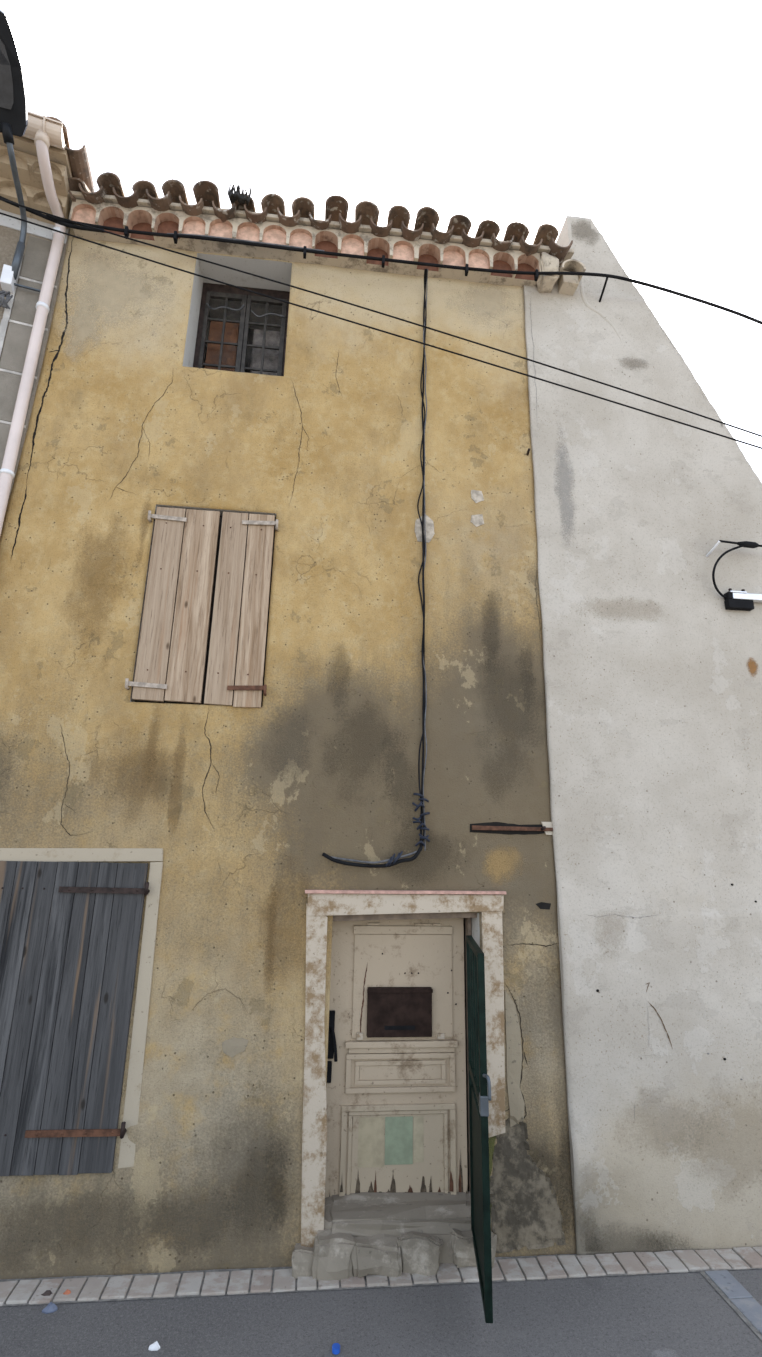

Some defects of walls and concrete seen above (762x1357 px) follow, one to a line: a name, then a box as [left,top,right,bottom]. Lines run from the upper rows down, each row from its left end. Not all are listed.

crack [11,240,73,557]
crack [111,377,173,497]
crack [290,377,309,502]
crack [60,725,93,836]
crack [202,715,220,825]
spalling [490,991,566,1253]